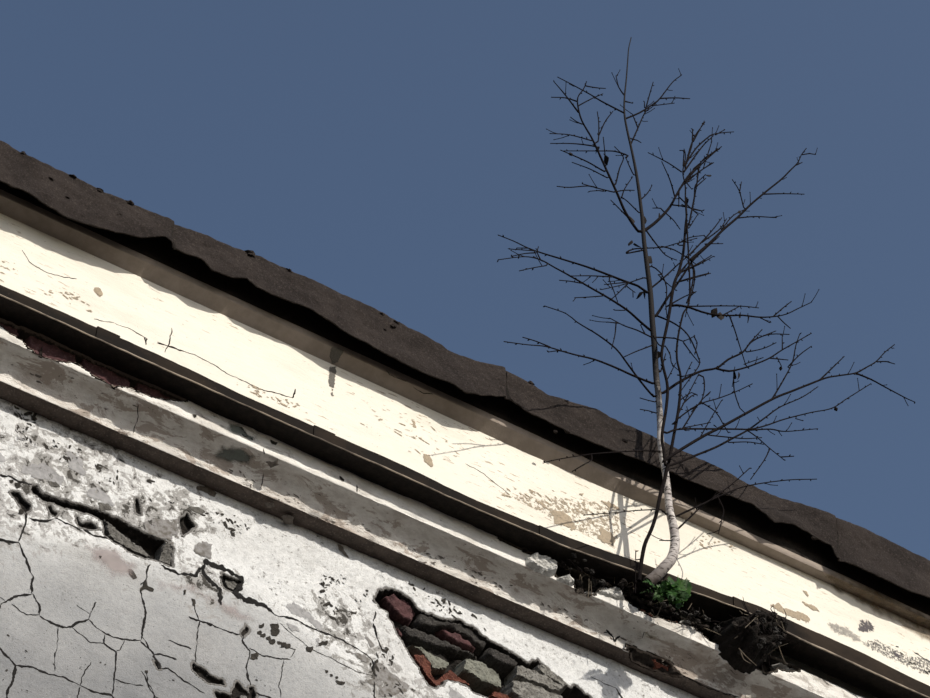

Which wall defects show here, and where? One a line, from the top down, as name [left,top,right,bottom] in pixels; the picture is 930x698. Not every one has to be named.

crack [97,319,296,398]
peeling [393,413,447,467]
crack [0,474,32,485]
spalling [8,405,249,568]
peeling [501,488,625,545]
spalling [128,569,154,591]
crack [0,513,382,698]
spalling [220,572,243,594]
spalling [239,574,593,698]